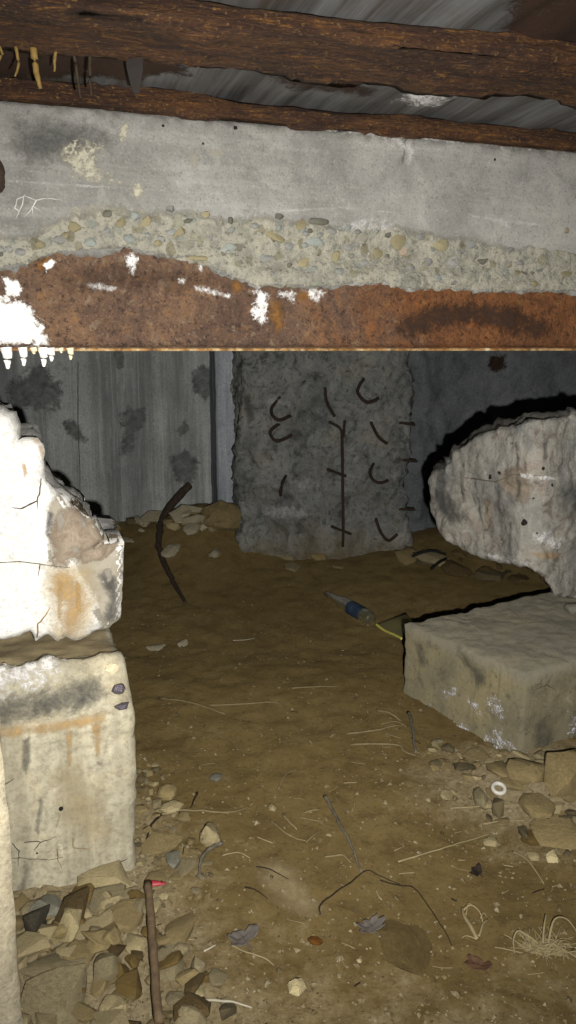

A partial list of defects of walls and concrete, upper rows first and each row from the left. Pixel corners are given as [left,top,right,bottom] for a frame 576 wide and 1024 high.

crack [14,195,59,218]
efflorescence [126,254,139,274]
efflorescence [0,277,74,369]
efflorescence [251,290,295,323]
corrosion [488,354,507,372]
peeling [63,421,85,441]
spalling [324,387,352,547]
crack [12,478,42,509]
spalling [48,499,120,582]
crack [0,561,70,577]
water stain [0,655,98,716]
corrosion [37,716,101,760]